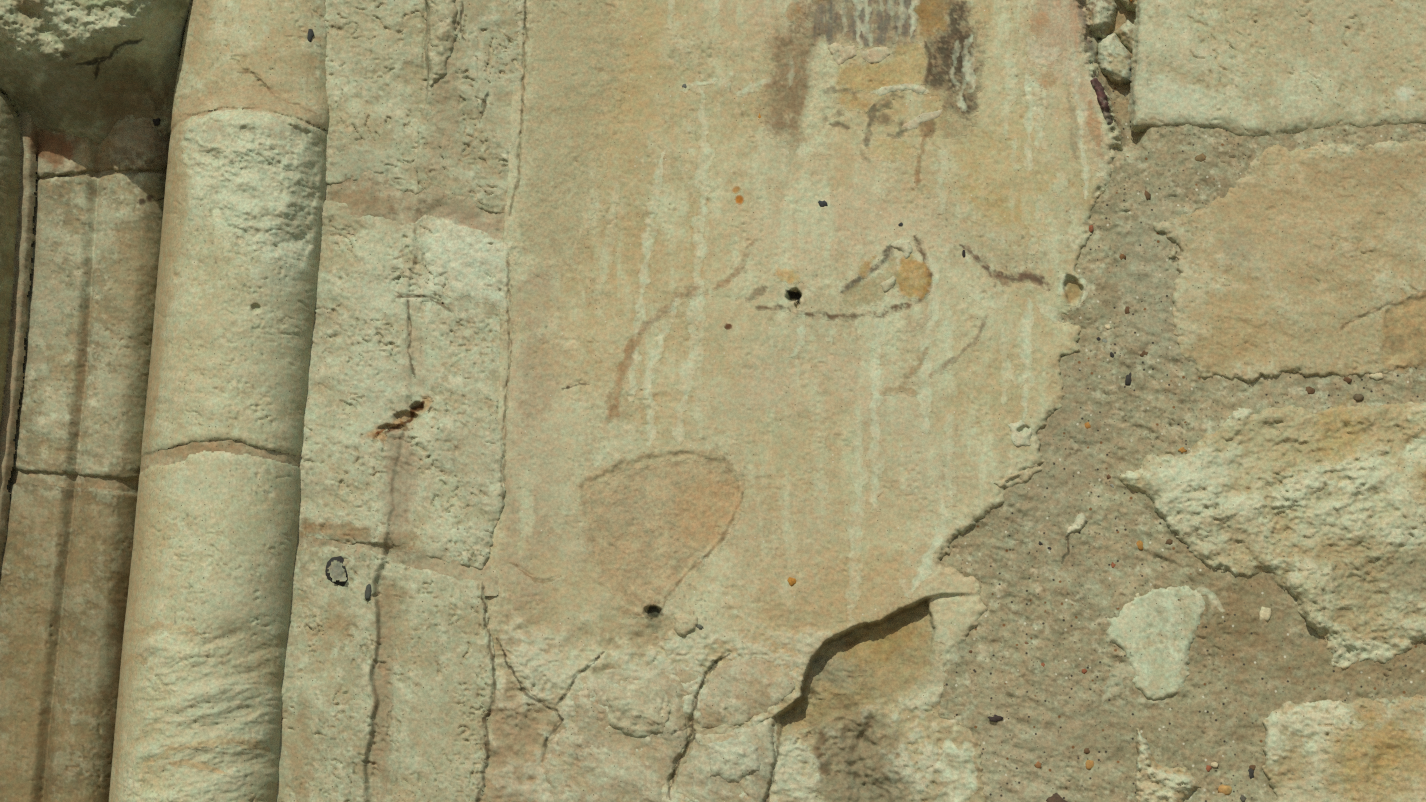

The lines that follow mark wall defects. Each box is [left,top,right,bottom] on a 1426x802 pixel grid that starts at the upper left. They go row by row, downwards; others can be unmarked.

water stain [839,0,921,51]
water stain [948,32,976,112]
water stain [998,31,1048,172]
water stain [1027,115,1111,256]
water stain [627,78,719,447]
water stain [966,274,1090,422]
efflorescence [844,303,887,633]
water stain [899,253,957,598]
crack [474,562,605,801]
crack [668,653,731,801]
crack [764,745,779,802]
flaking render [769,589,944,802]